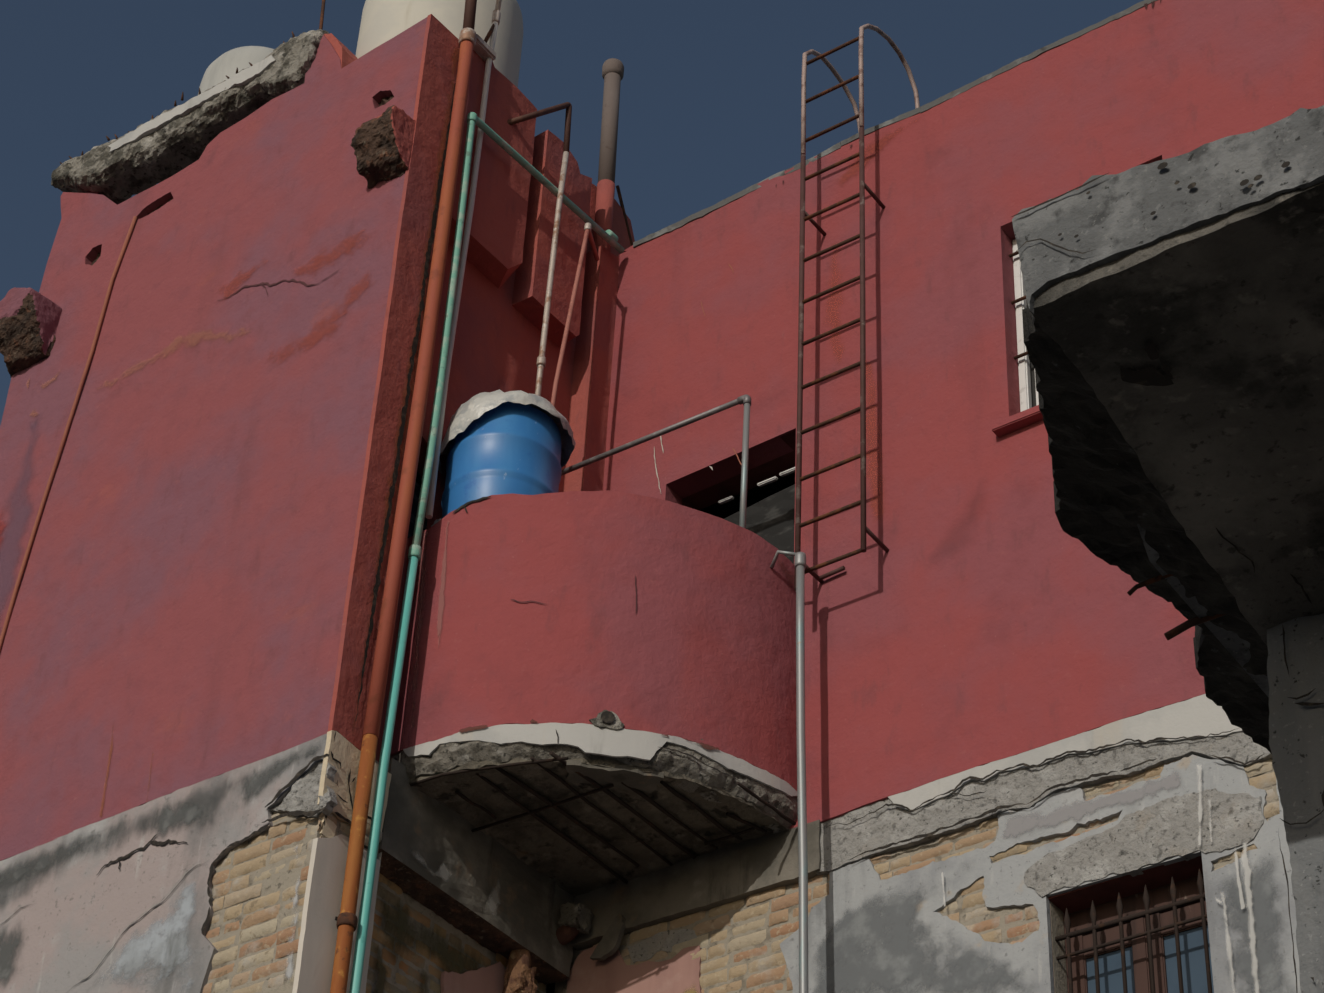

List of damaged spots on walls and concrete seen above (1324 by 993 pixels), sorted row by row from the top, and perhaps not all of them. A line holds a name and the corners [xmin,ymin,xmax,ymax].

crack [221,271,337,300]
leakage [0,930,20,984]
crack [97,834,187,875]
flaking render [67,754,383,993]
flaking render [366,873,508,993]
spalling [409,751,796,897]
flaking render [567,874,830,993]
leakage [815,893,1019,993]
flaking render [853,759,1181,880]
leakage [1197,765,1212,845]
leakage [1216,843,1282,993]
flaking render [1244,759,1280,821]